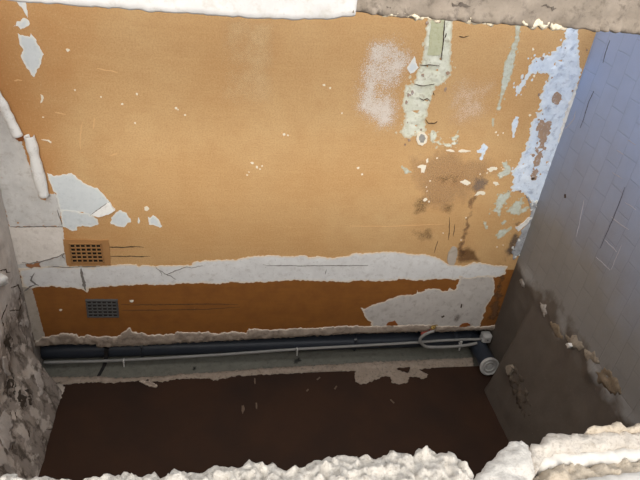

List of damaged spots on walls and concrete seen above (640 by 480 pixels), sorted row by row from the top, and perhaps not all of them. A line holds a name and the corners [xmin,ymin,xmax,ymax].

peeling [16,2,44,77]
efflorescence [351,33,417,132]
peeling [395,14,488,160]
peeling [479,19,588,260]
crack [0,246,198,326]
peeling [0,112,508,348]
damp [459,222,477,261]
spalling [51,357,474,405]